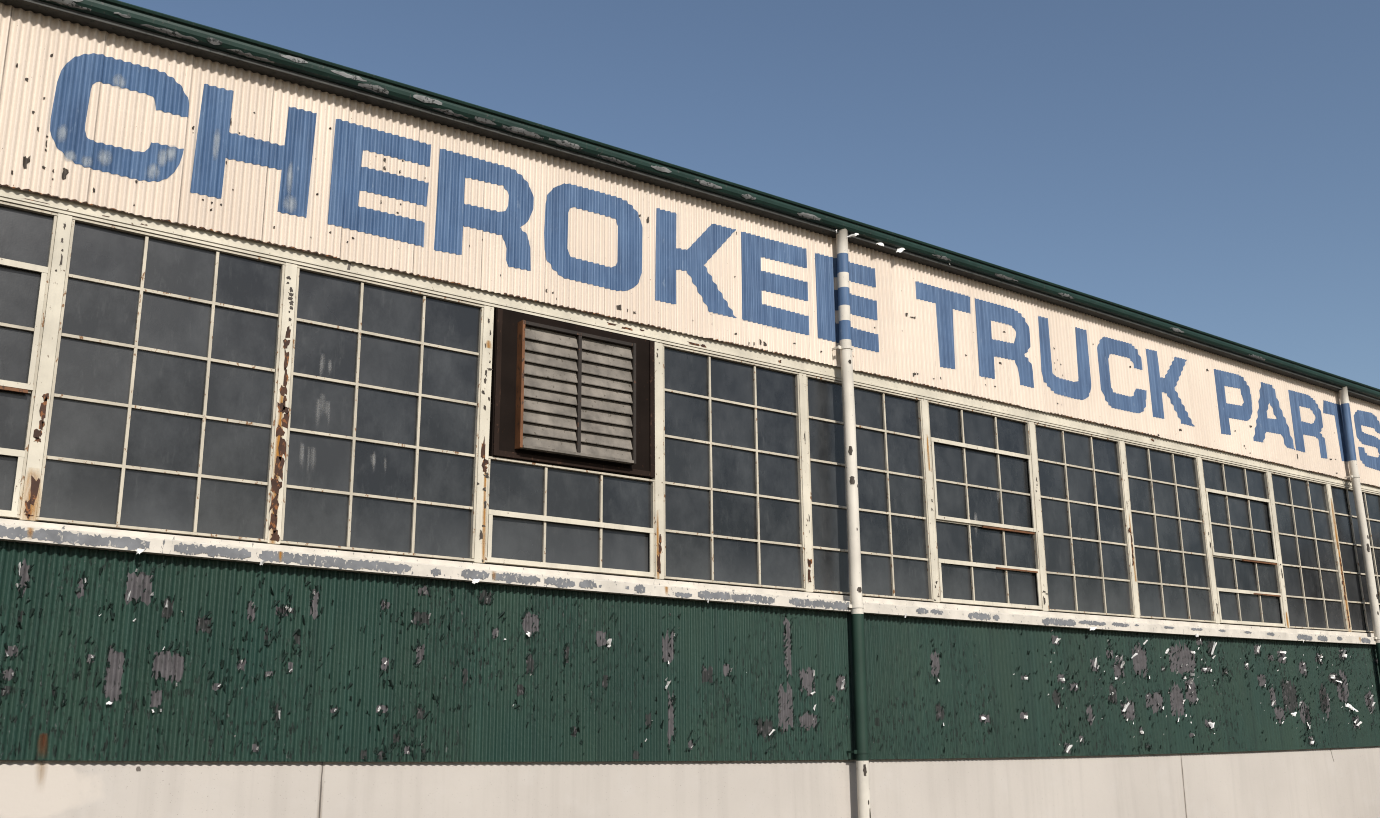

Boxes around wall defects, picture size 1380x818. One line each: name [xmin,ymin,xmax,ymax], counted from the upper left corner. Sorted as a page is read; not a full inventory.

corrosion [33,393,49,442]
corrosion [269,326,291,559]
corrosion [24,475,40,534]
peeling [0,525,182,626]
peeling [174,542,411,574]
peeling [461,559,602,605]
peeling [86,646,125,705]
peeling [150,646,184,713]
peeling [652,613,693,750]
peeling [675,587,862,740]
peeling [1042,591,1228,738]
peeling [1244,631,1375,745]